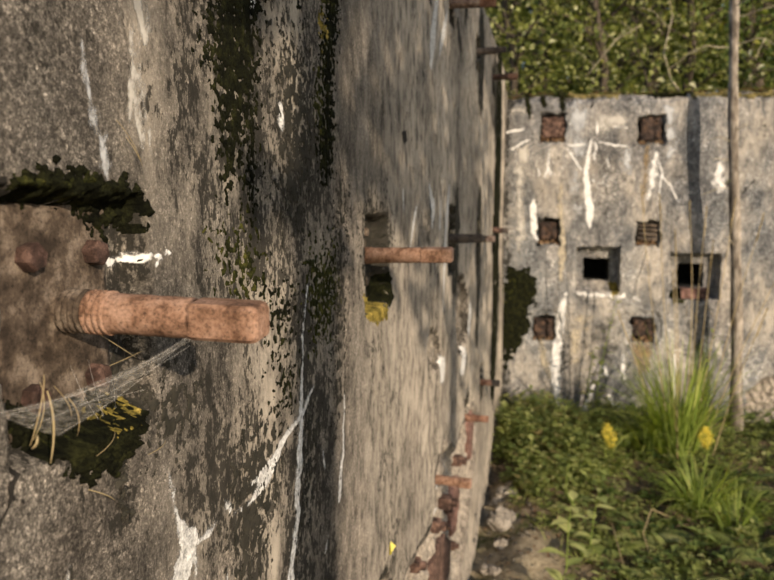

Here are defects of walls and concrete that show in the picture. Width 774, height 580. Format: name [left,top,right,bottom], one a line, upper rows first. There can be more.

damp [662,105,677,158]
spalling [743,375,774,421]
spalling [403,400,479,580]
spalling [379,558,393,580]